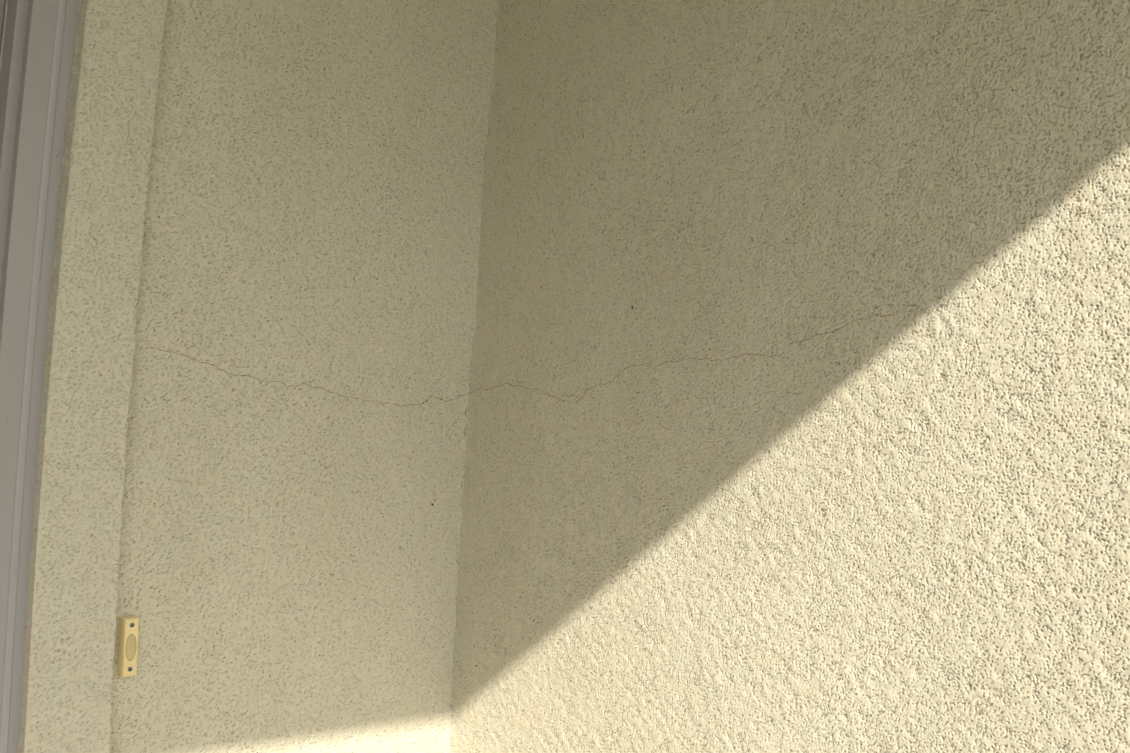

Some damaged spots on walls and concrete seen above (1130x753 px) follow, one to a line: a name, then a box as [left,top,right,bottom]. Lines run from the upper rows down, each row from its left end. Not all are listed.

crack [137,297,969,437]